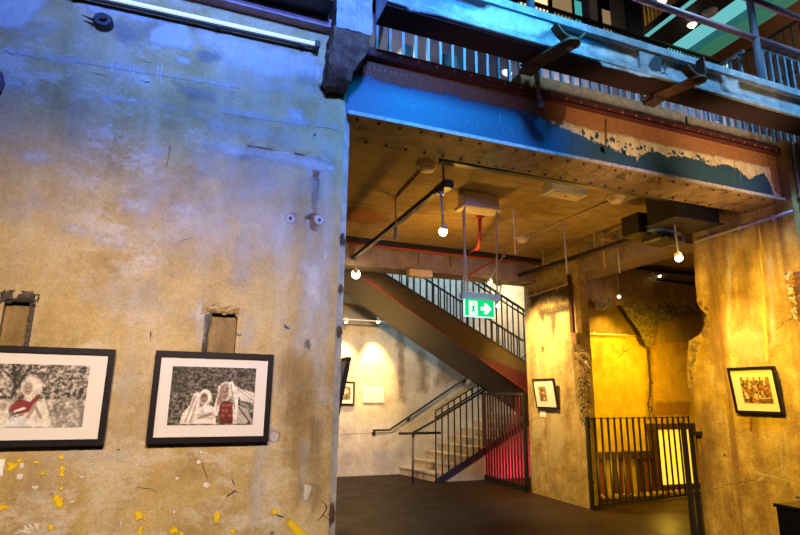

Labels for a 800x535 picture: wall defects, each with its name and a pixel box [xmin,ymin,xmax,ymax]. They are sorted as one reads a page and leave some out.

peeling [346,73,775,196]
corrosion [353,58,782,196]
damp [530,284,569,336]
spalling [571,334,593,434]
crack [646,348,654,420]
spalling [593,296,711,394]
spalling [784,271,800,321]